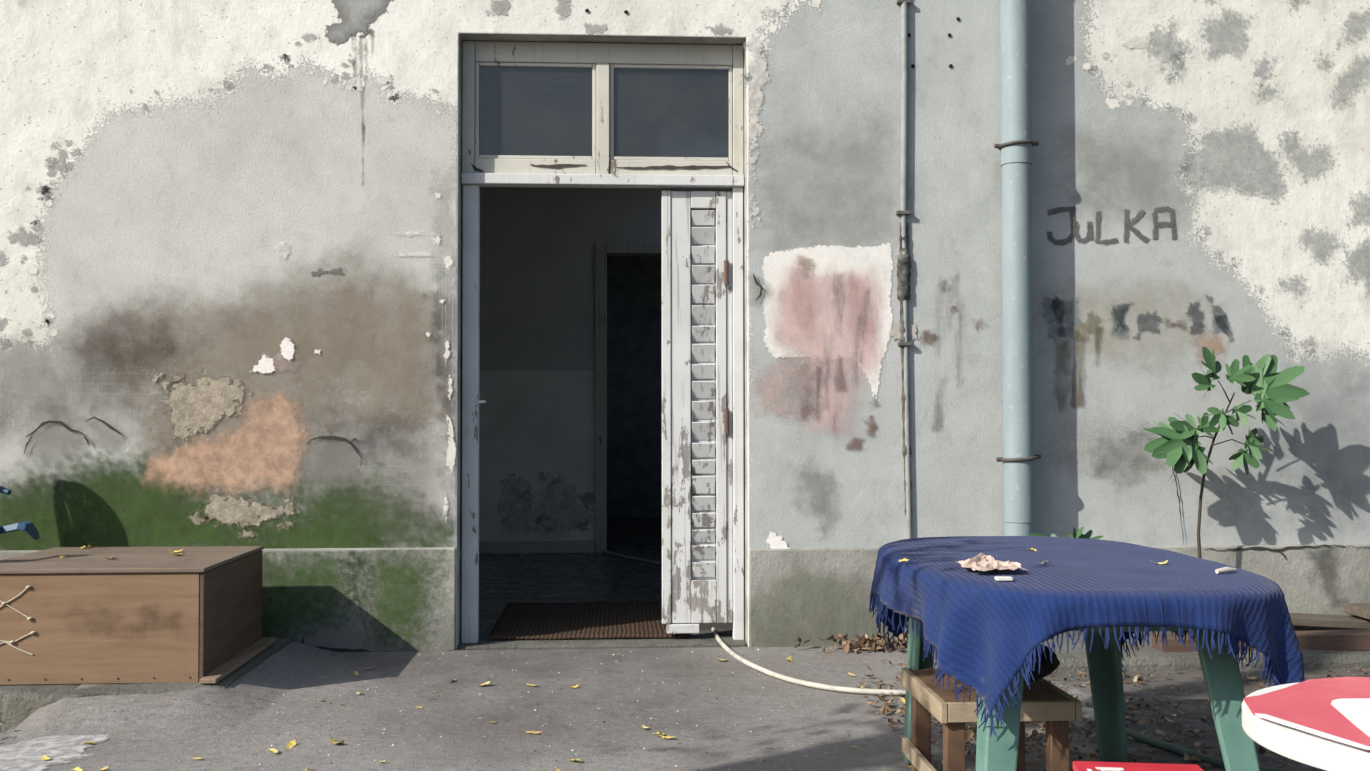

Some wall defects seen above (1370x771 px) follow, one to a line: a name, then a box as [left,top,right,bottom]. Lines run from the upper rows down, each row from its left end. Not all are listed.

peeling [485,0,510,16]
peeling [704,23,733,37]
peeling [0,0,457,548]
peeling [741,0,1004,549]
peeling [1031,0,1370,546]
crack [24,417,125,454]
damp [86,282,449,465]